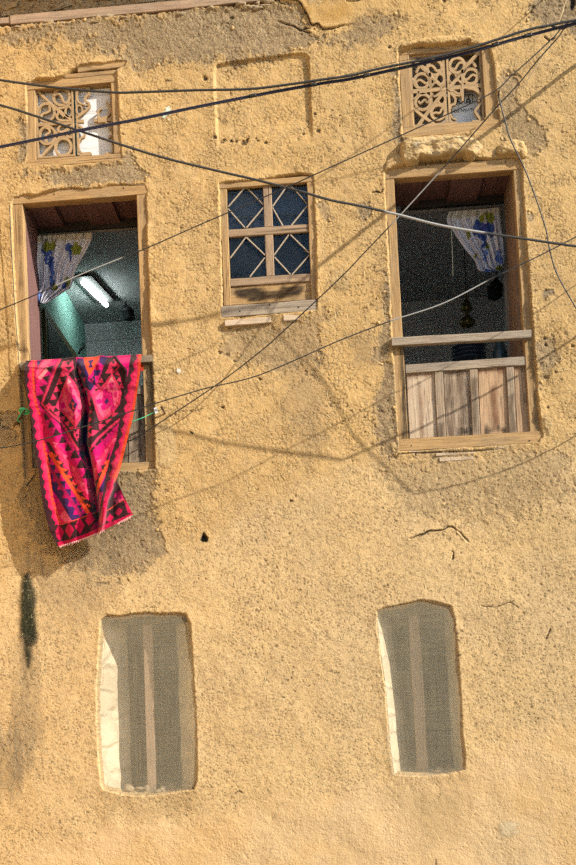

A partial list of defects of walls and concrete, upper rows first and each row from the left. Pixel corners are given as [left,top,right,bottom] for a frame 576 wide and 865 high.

flaking render [0,0,325,71]
crack [411,526,470,560]
water stain [20,574,37,667]